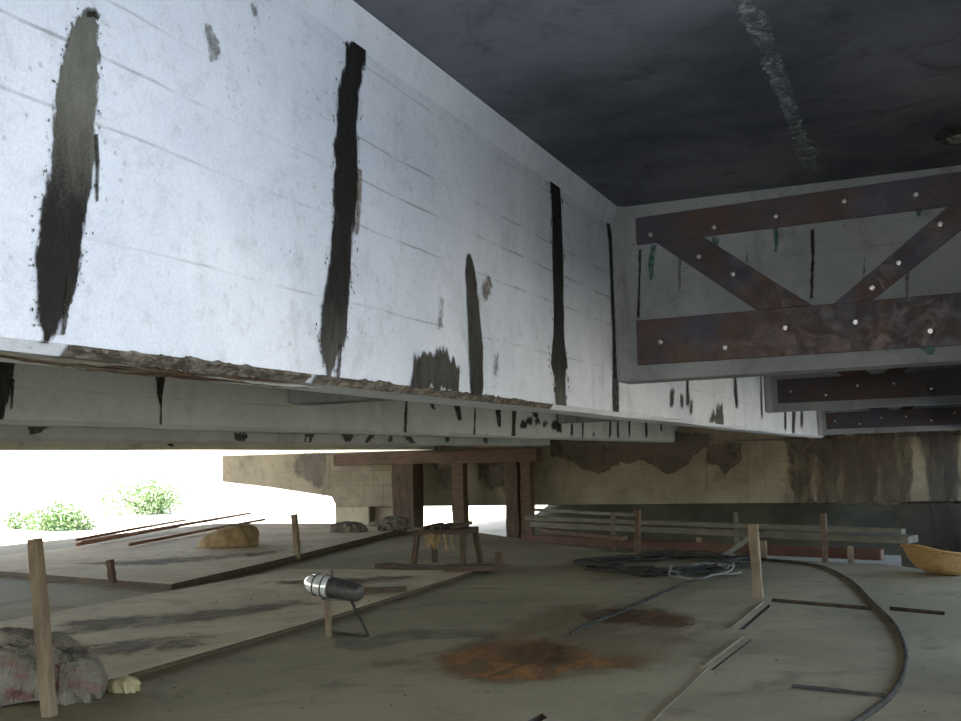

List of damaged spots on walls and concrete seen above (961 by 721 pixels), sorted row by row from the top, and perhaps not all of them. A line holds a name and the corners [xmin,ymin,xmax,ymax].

spalling [0,345,554,409]
leakage [411,347,460,393]
peeling [549,431,742,474]
leakage [784,430,961,552]